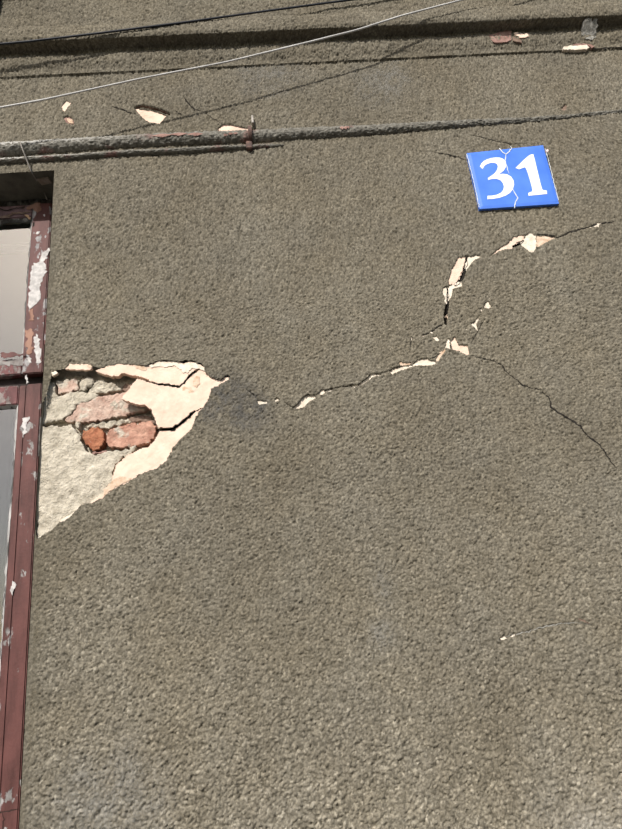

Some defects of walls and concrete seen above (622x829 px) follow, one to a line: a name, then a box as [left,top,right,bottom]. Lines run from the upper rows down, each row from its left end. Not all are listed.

flaking render [489,30,529,44]
spalling [562,17,598,53]
flaking render [136,105,169,124]
flaking render [218,125,253,136]
crack [555,221,615,238]
peeling [0,248,50,384]
crack [249,255,615,466]
spalling [37,359,230,538]